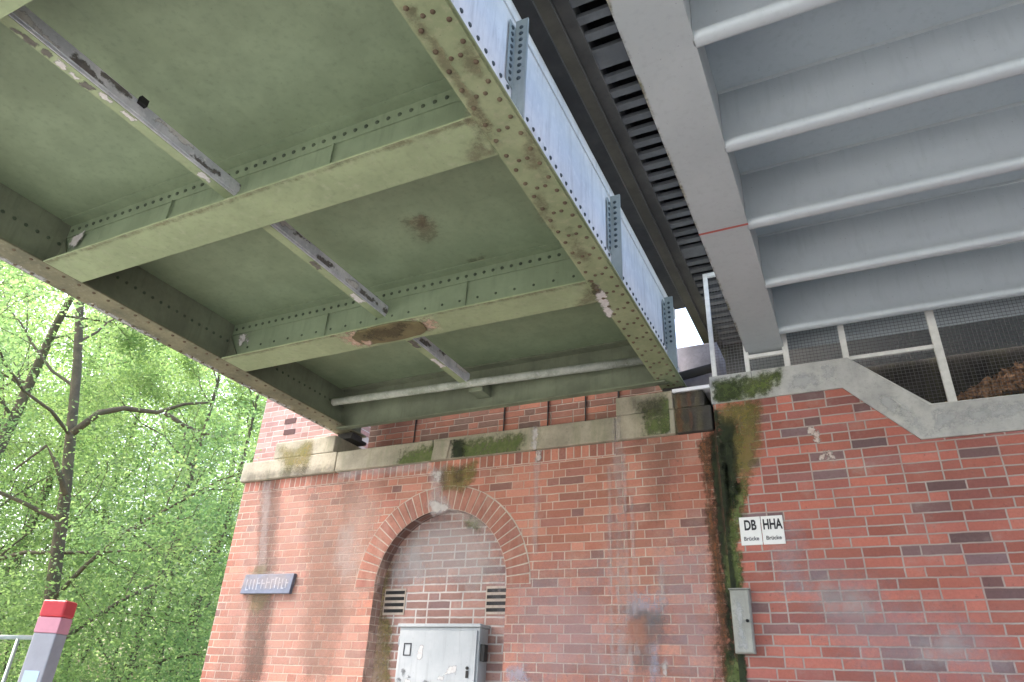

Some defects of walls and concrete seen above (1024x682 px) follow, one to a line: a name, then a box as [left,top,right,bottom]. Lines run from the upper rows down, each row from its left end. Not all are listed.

peeling [10,9,137,121]
peeling [190,155,221,183]
peeling [309,255,333,270]
peeling [350,289,388,314]
peeling [588,280,613,317]
rust [338,318,439,346]
damp [451,440,464,458]